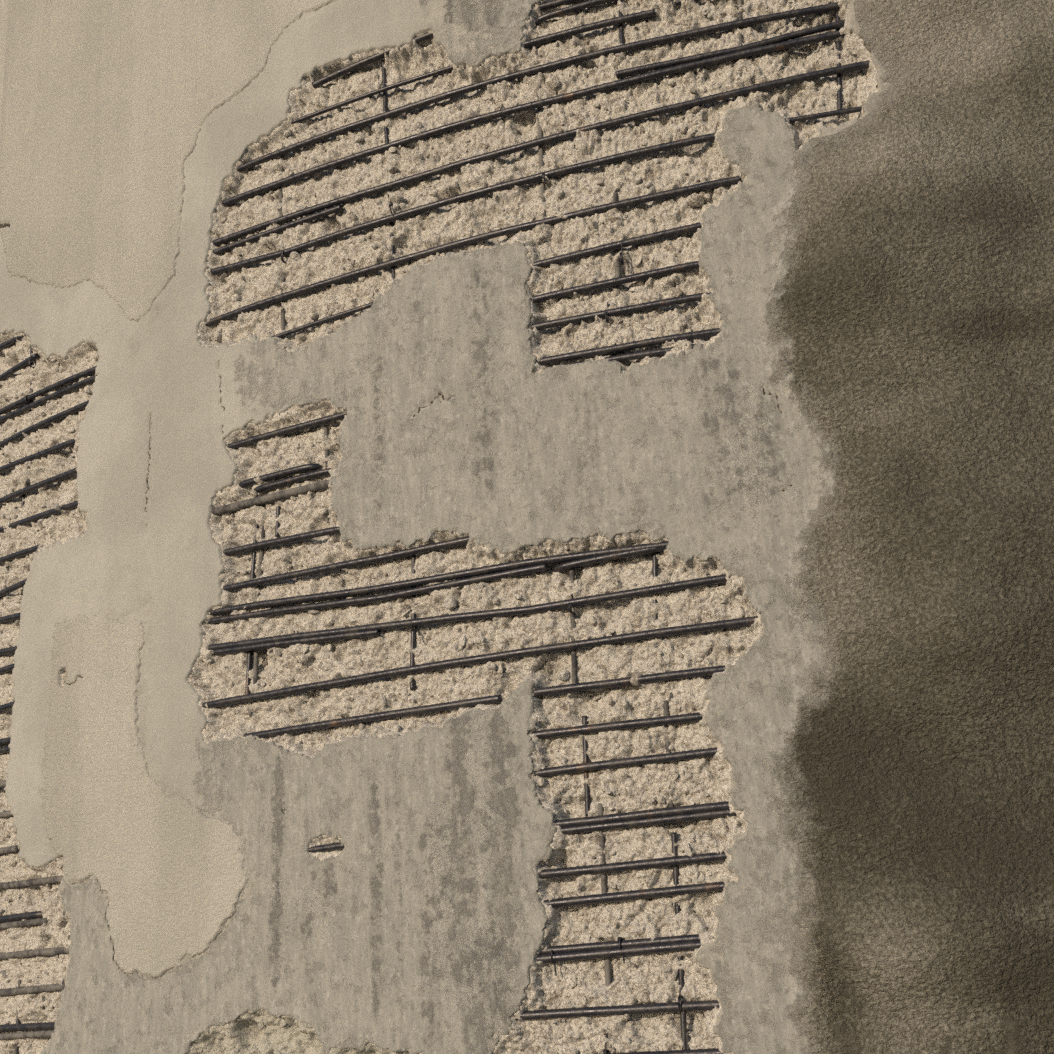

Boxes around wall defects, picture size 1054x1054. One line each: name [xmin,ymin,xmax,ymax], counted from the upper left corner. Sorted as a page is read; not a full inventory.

flaking render [0,0,337,322]
spalling [0,331,764,1054]
spalling [196,0,878,1054]
leakage [766,0,1054,1054]